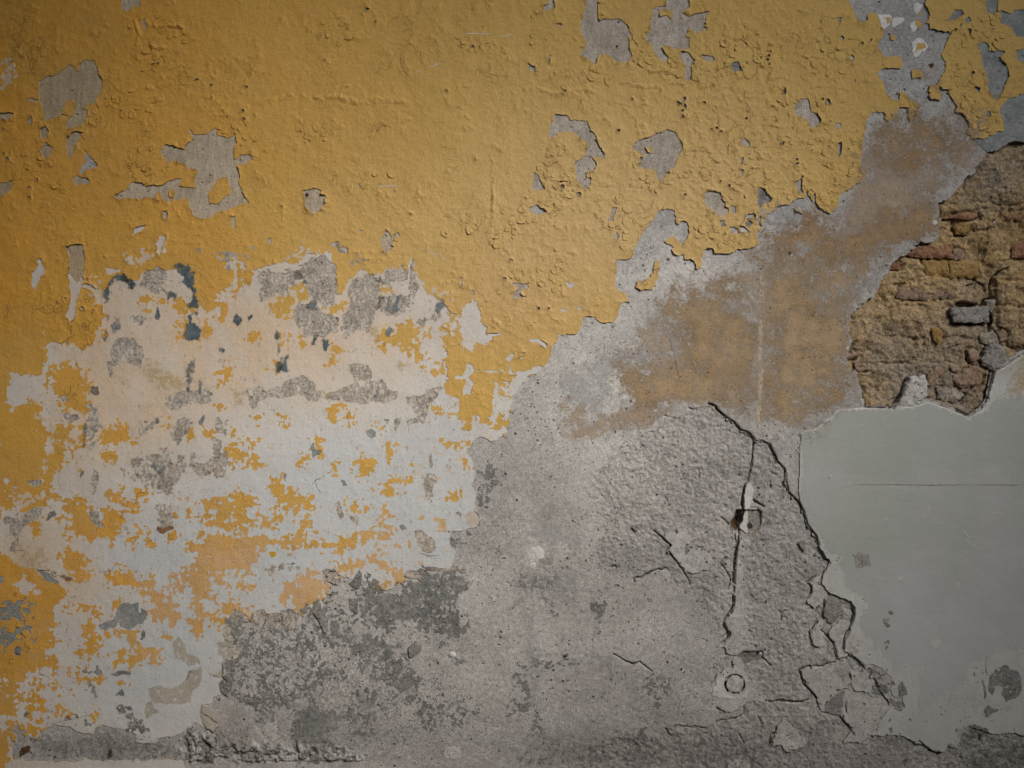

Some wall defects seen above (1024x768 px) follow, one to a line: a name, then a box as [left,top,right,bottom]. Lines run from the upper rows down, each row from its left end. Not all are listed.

peeling [645,0,715,80]
peeling [0,60,103,162]
peeling [114,128,255,229]
spalling [846,0,1024,413]
peeling [256,241,454,339]
peeling [246,363,442,433]
peeling [120,387,230,529]
crack [610,531,690,583]
crack [664,404,817,642]
peeling [183,524,486,768]
crack [716,565,855,746]
spalling [947,665,1022,748]